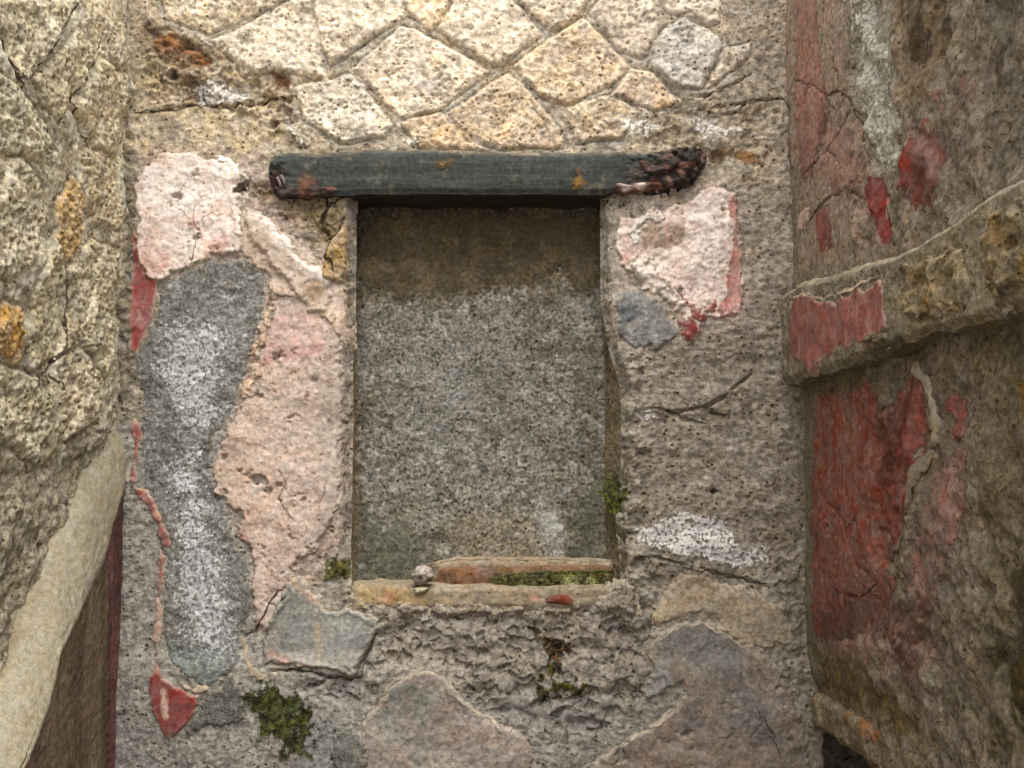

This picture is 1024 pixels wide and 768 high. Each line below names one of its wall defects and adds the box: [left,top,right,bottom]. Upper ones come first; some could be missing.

crack [0,0,99,150]
crack [695,56,871,225]
crack [24,271,68,390]
peeling [789,275,887,377]
crack [636,374,751,424]
leakage [633,510,770,570]
peeling [810,360,971,708]